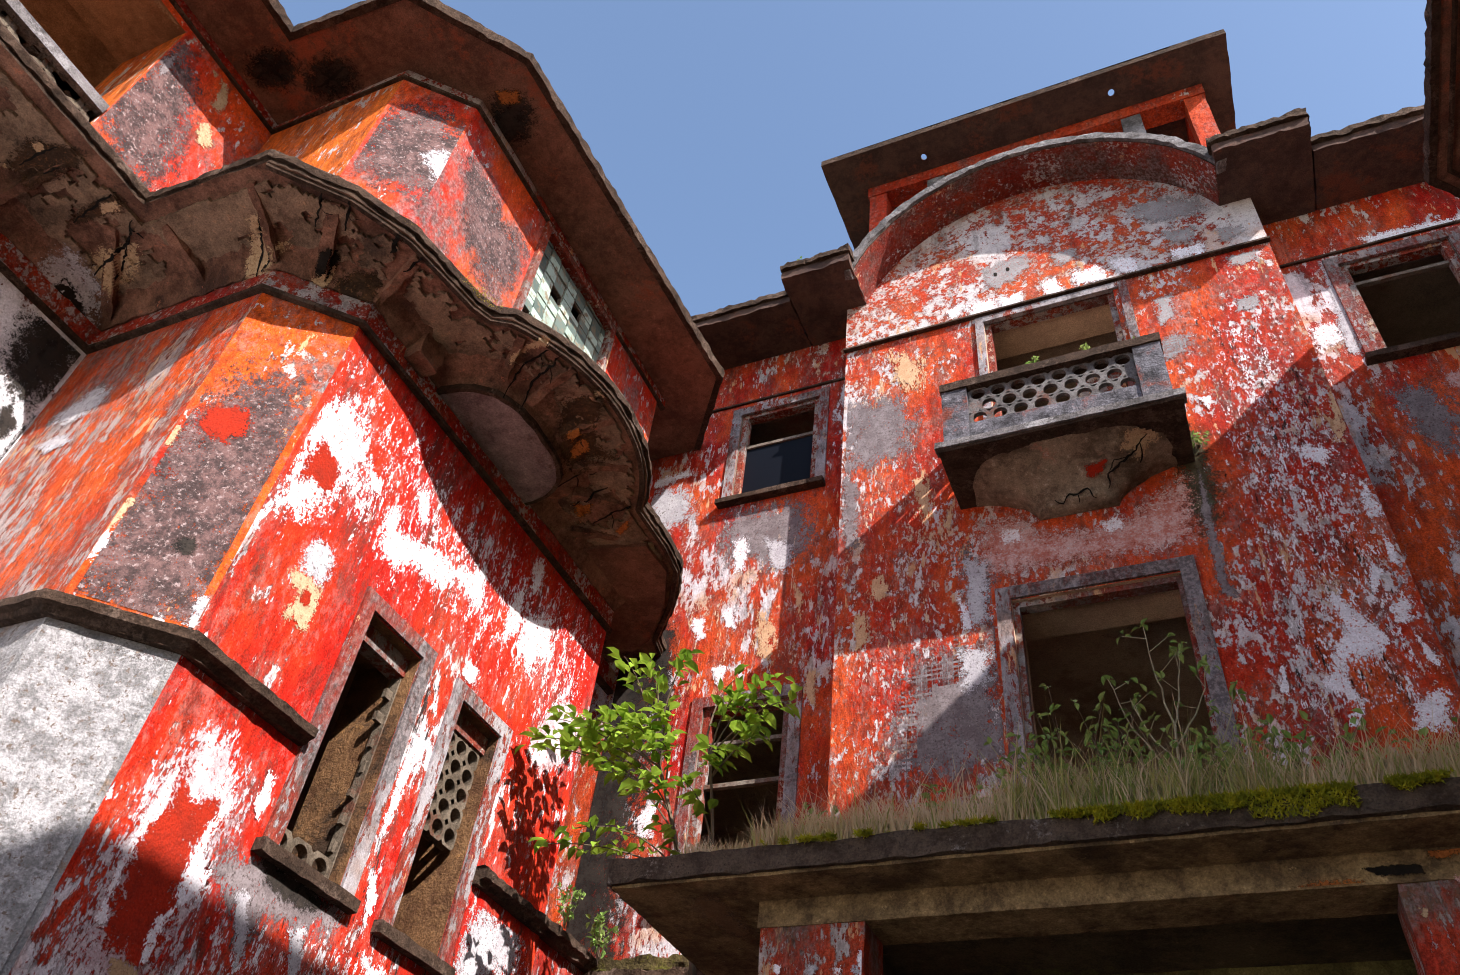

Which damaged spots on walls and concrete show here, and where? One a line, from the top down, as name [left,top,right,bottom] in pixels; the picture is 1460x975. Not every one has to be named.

damp [242,44,363,104]
peeling [1169,242,1206,259]
peeling [1357,214,1460,243]
damp [0,307,81,461]
crack [1055,434,1147,504]
peeling [274,365,602,788]
peeling [379,739,418,845]
peeling [632,800,657,839]
peeling [453,903,529,975]